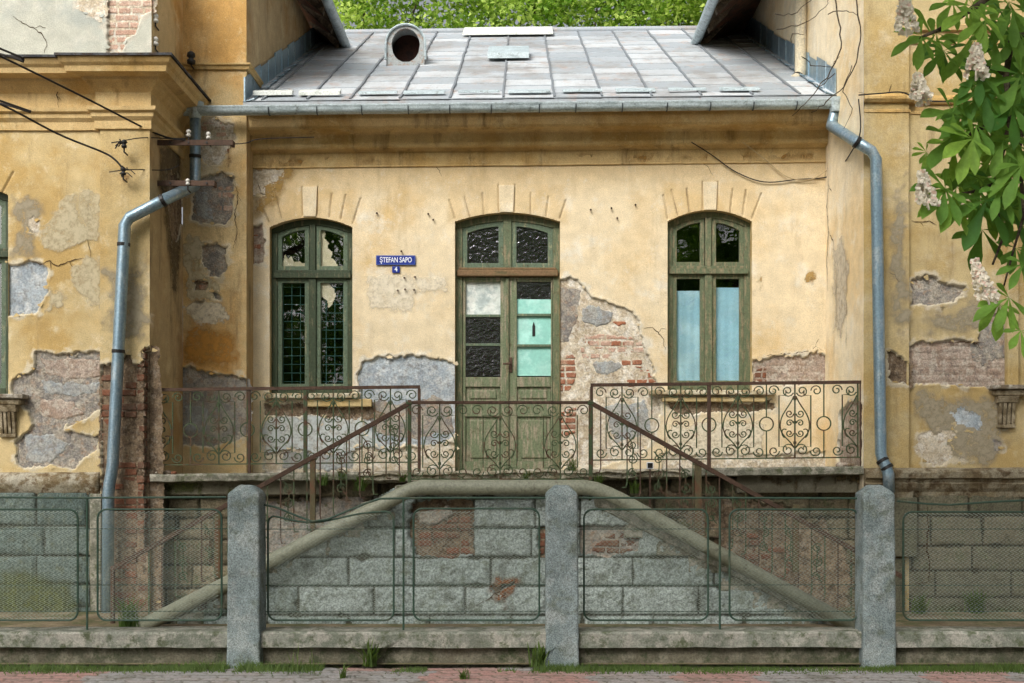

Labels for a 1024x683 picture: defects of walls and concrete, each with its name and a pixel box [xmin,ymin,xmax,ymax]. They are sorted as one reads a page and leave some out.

flaking render [76,0,157,53]
flaking render [192,117,284,225]
flaking render [5,261,49,317]
flaking render [183,243,229,326]
flaking render [909,274,969,307]
flaking render [560,278,776,468]
flaking render [752,351,825,387]
flaking render [886,313,1005,389]
flaking render [183,353,459,473]
peeling [914,406,982,467]
flaking render [12,345,165,611]